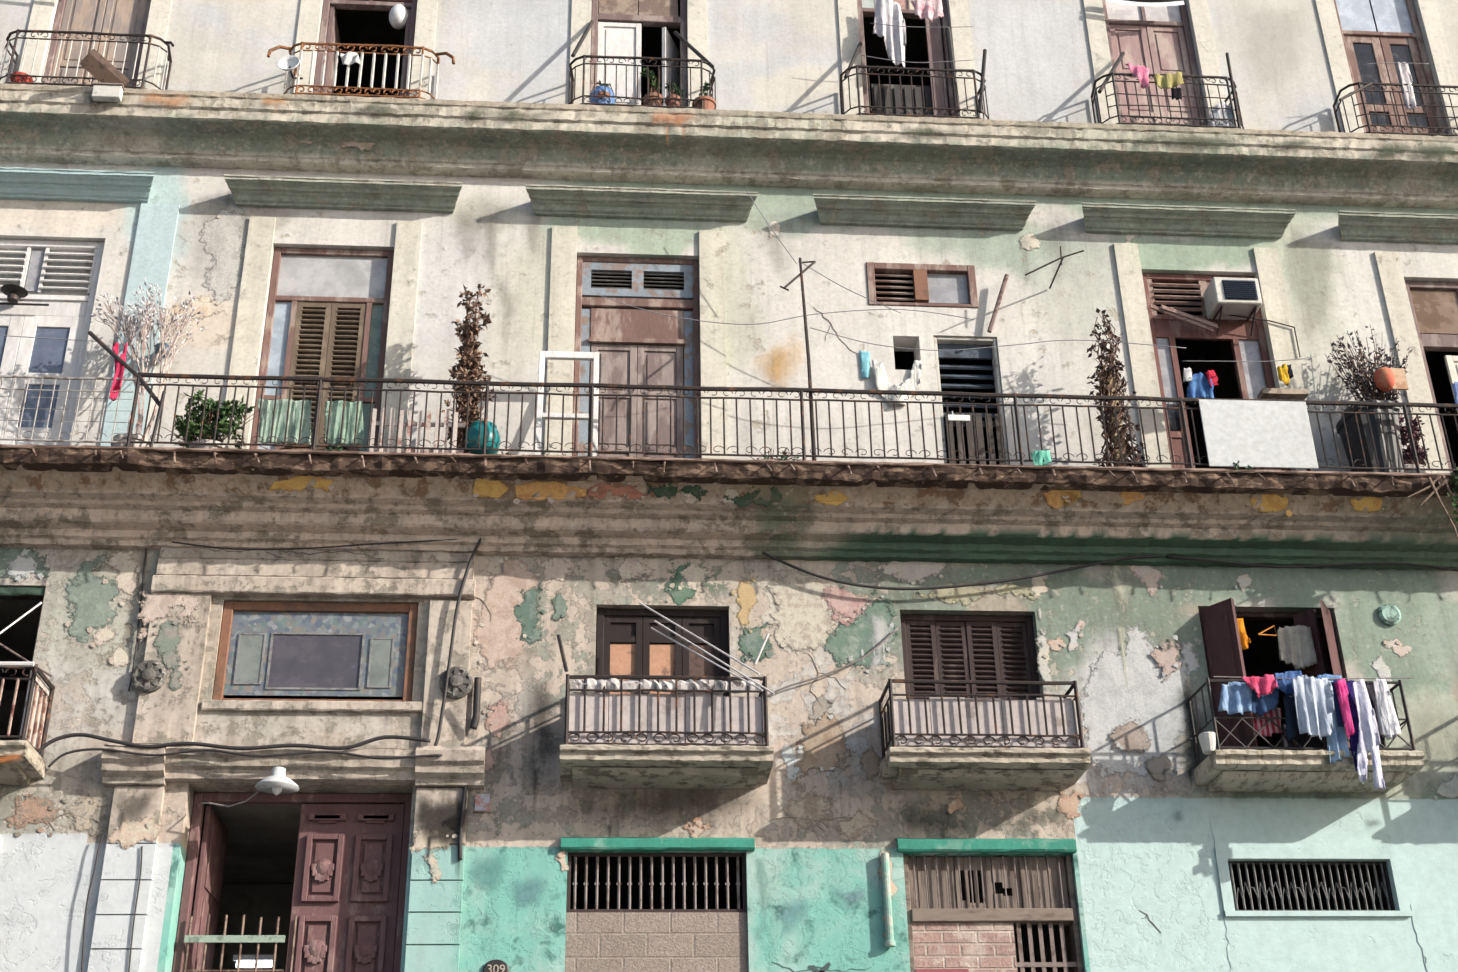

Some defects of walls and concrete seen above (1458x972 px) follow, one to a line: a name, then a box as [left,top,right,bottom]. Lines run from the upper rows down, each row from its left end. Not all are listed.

peeling [168,207,249,332]
spalling [473,478,784,508]
spalling [814,489,849,506]
spalling [1042,490,1082,508]
peeling [0,547,200,691]
peeling [472,556,576,673]
peeling [731,561,1085,690]
peeling [1128,565,1163,597]
peeling [5,793,163,849]
peeling [483,697,515,775]
peeling [780,694,881,844]
peeling [1075,623,1200,782]